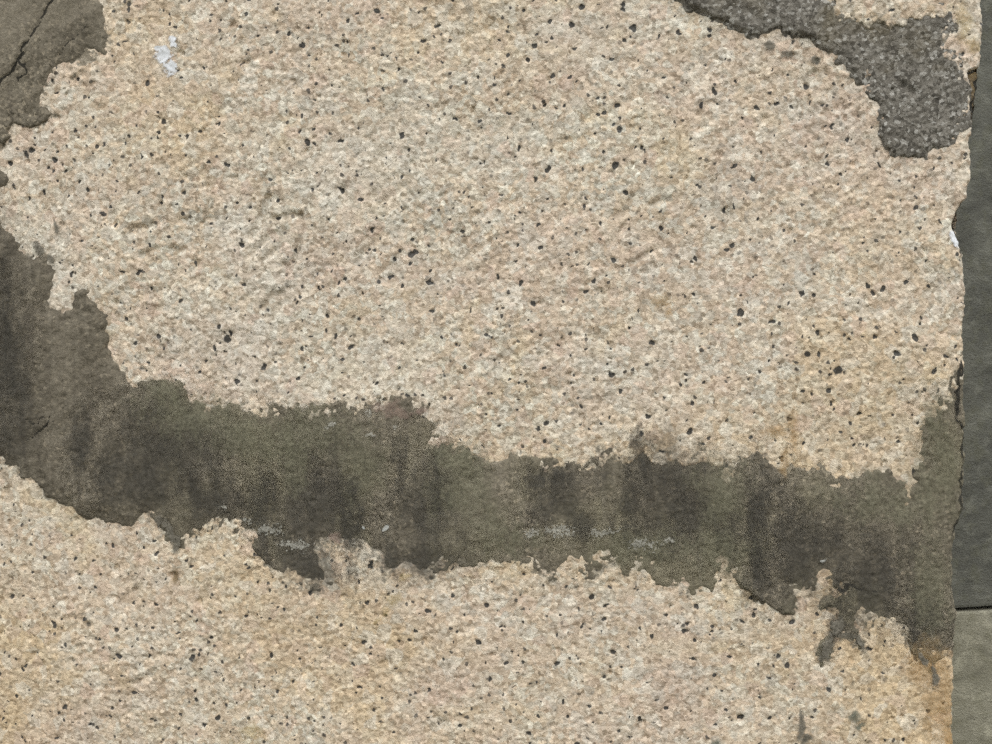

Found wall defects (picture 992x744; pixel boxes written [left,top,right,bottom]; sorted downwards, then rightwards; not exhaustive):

crack [0,0,53,83]
water stain [243,478,334,579]
water stain [524,473,621,540]